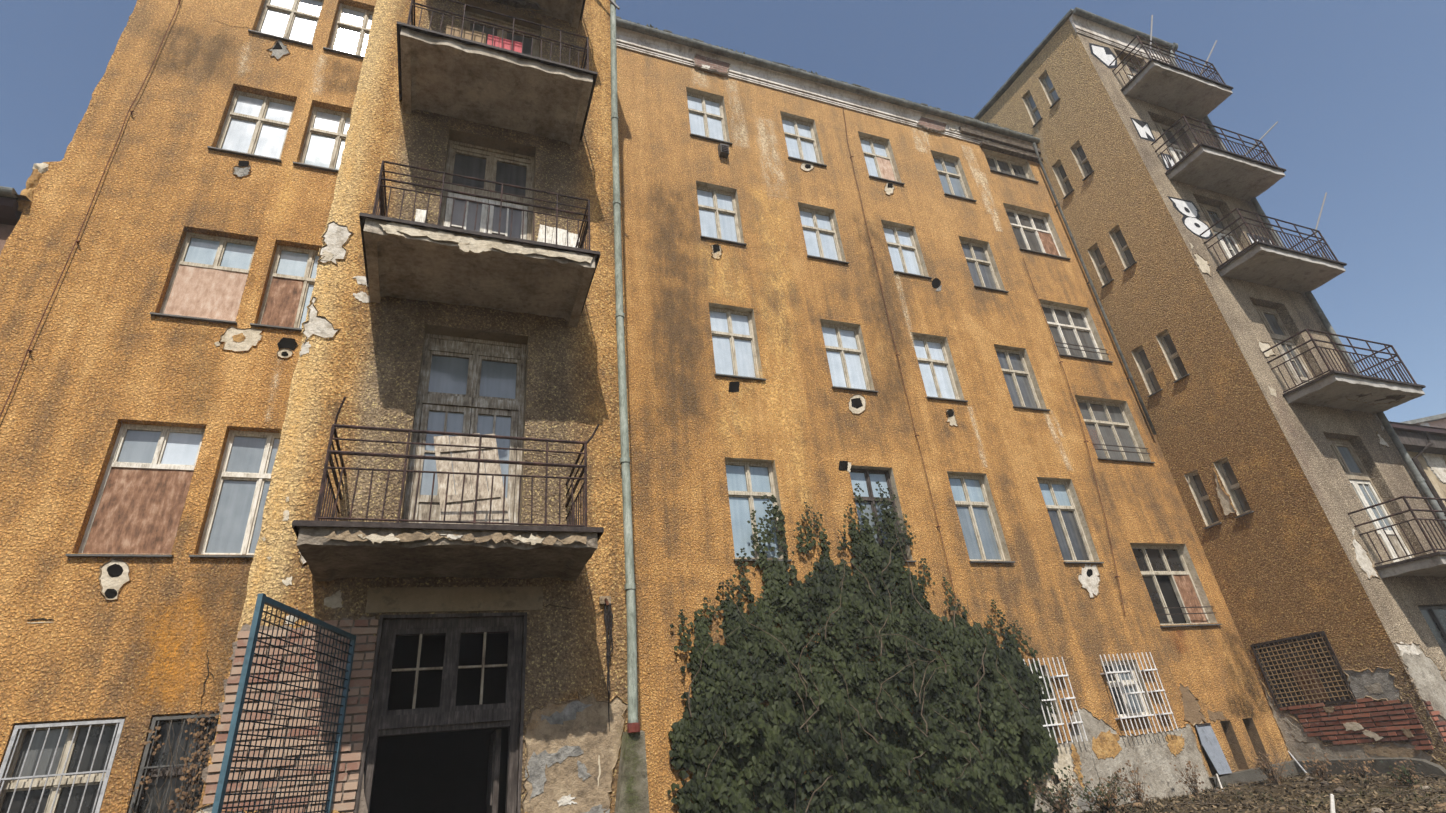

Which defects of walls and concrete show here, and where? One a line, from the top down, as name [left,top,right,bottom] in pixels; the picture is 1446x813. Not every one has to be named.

peeling [317,220,354,266]
peeling [353,276,370,303]
peeling [214,296,341,359]
peeling [282,551,307,586]
spalling [322,530,587,546]
spalling [1077,563,1101,599]
flaking render [196,590,379,813]
flaking render [1262,641,1446,762]
flaking render [521,691,628,813]
flaking render [1032,683,1228,813]